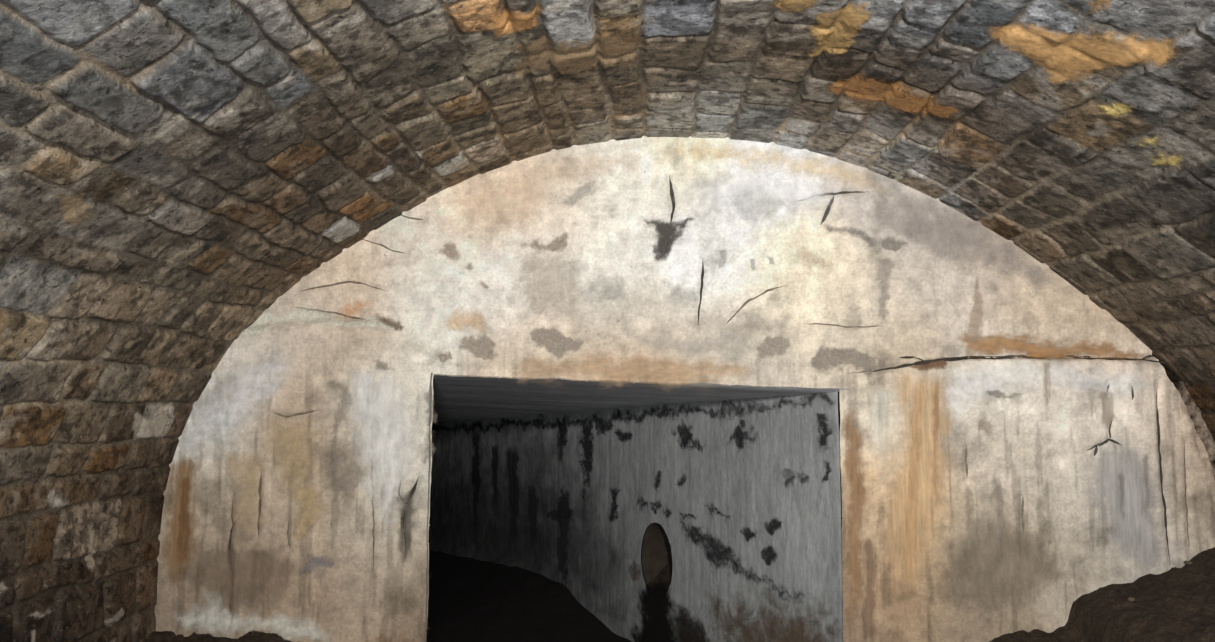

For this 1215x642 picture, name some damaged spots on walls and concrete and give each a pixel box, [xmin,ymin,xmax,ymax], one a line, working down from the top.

crack [668,175,676,222]
crack [698,262,786,325]
crack [798,191,869,225]
leakage [428,394,832,601]
leakage [630,471,834,642]
crack [849,355,1190,561]